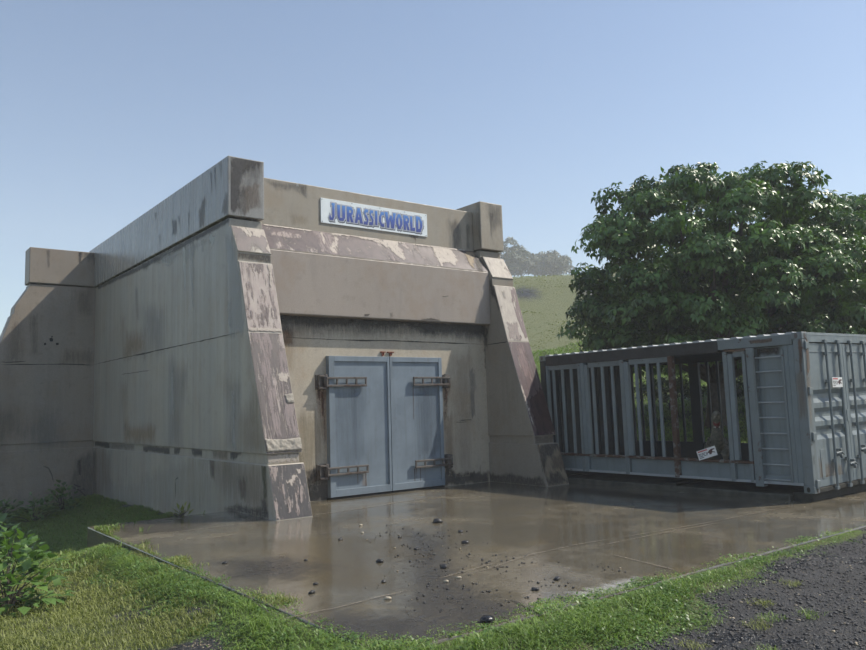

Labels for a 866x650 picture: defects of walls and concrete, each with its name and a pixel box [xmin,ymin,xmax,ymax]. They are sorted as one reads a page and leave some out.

water stain [98,158,261,289]
peeling [232,224,569,520]
water stain [307,468,328,501]
water stain [445,444,545,486]